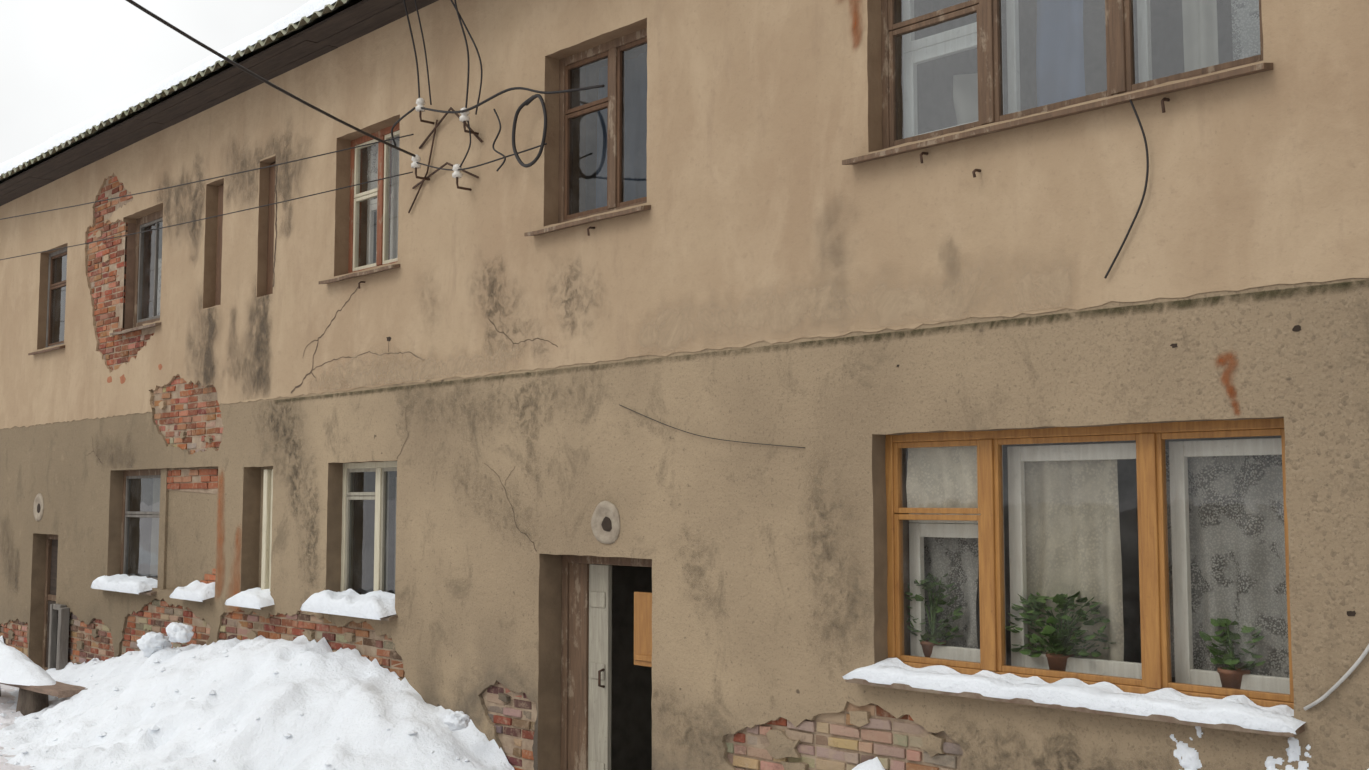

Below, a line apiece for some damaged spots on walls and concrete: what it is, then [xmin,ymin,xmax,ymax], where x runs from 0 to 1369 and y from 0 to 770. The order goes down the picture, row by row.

flaking render [87,176,156,384]
corrosion [1217,354,1239,414]
flaking render [152,364,224,494]
flaking render [68,599,405,679]
flaking render [482,682,537,770]
flaking render [726,703,964,770]